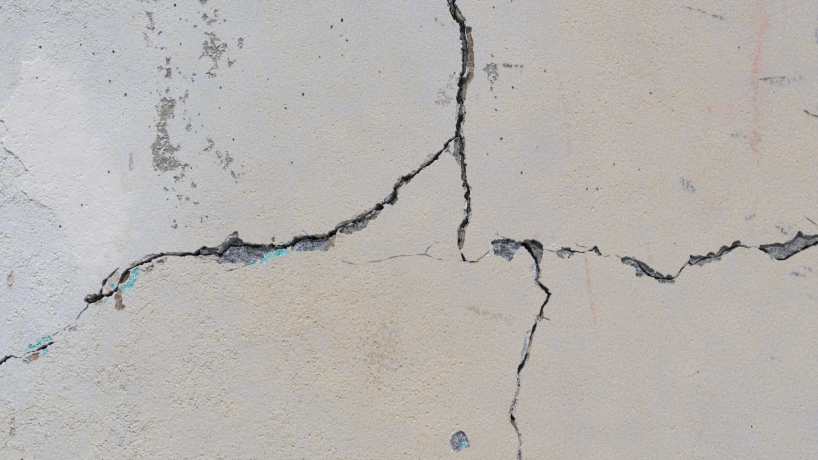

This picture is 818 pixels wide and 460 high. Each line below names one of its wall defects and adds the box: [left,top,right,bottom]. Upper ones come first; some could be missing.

crack [0,0,491,365]
spalling [139,0,384,270]
spalling [446,430,471,454]
crack [508,215,818,460]